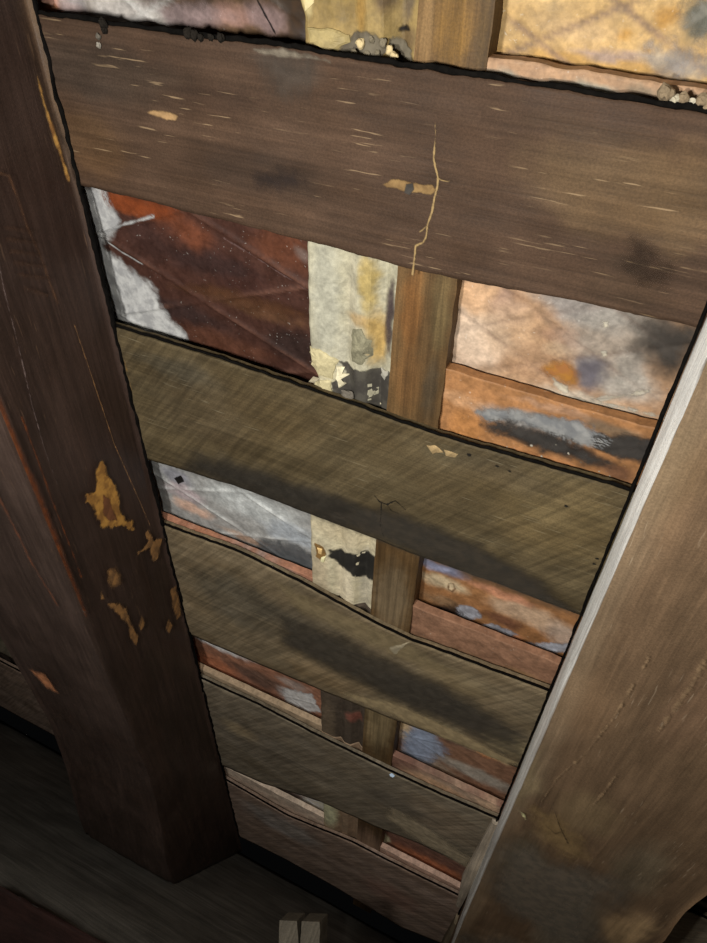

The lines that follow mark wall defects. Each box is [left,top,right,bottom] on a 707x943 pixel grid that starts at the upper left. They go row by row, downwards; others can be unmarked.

spalling [384,179,435,195]
crack [412,131,448,275]
peeling [86,461,134,530]
peeling [138,531,162,561]
peeling [109,570,120,586]
peeling [101,593,144,645]
peeling [166,587,181,633]